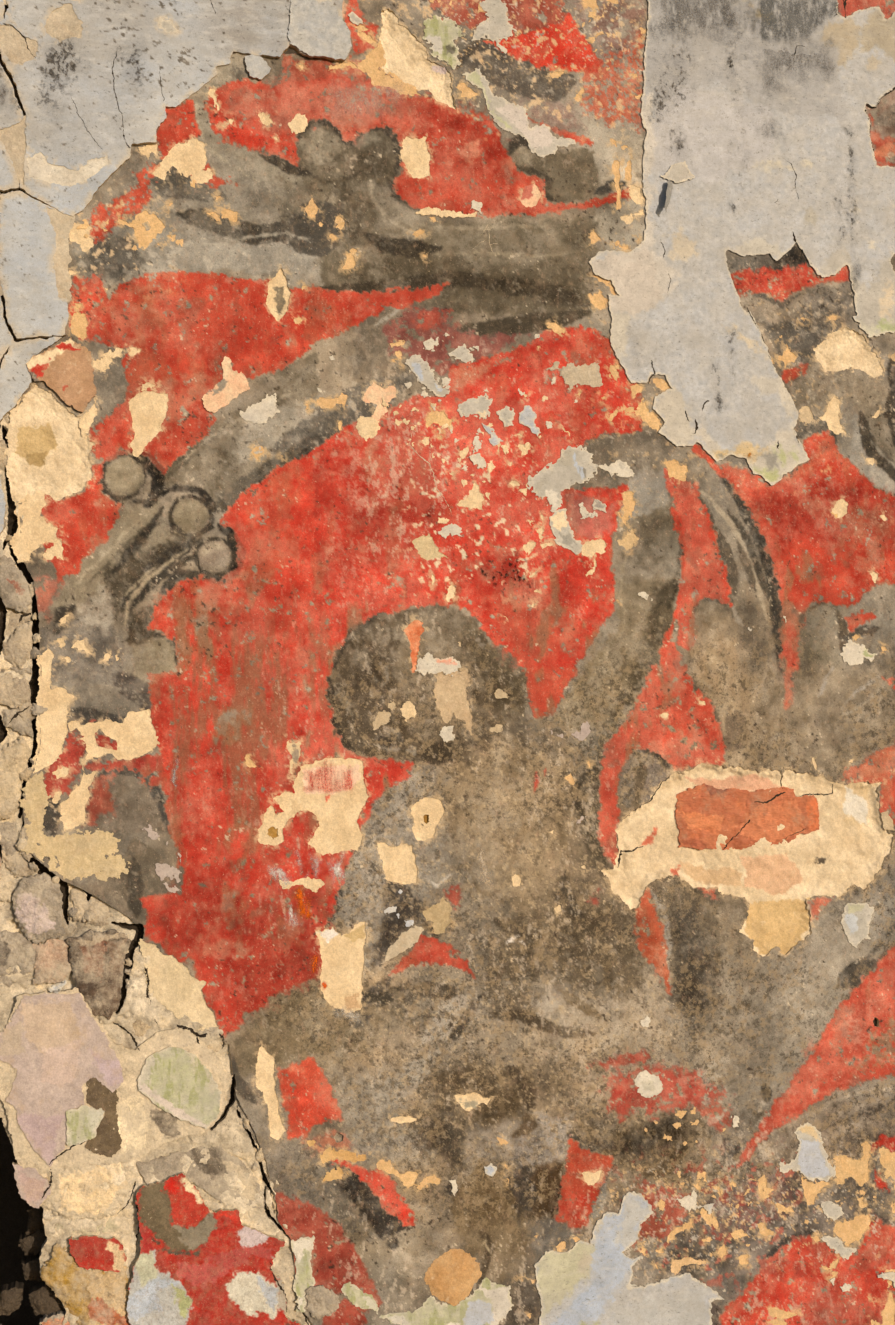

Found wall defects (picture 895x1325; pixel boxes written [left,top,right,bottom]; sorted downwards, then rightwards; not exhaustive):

crack [0,5,35,116]
crack [73,51,130,149]
crack [0,295,63,368]
flaking render [0,203,183,563]
peeling [305,333,670,577]
flaking render [19,614,160,882]
crack [0,424,285,1232]
flaking render [258,741,452,961]
flaking render [581,757,895,956]
flaking render [315,922,367,1013]
peeling [341,1277,536,1325]
peeling [640,1122,895,1292]